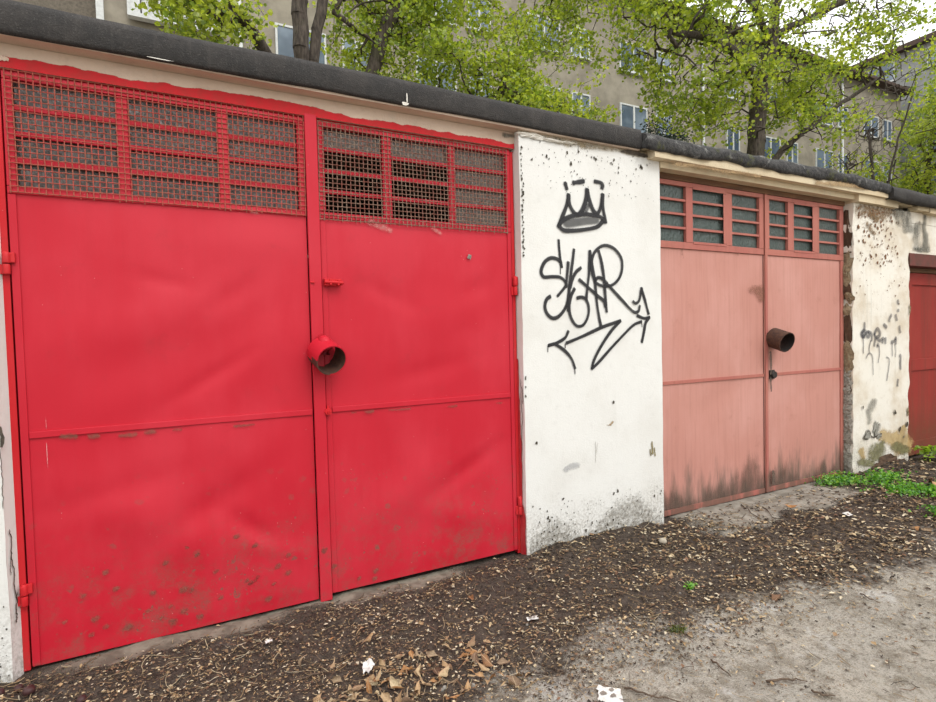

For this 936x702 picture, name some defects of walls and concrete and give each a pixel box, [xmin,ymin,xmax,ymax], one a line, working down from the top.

spalling [843,210,855,474]
peeling [865,421,882,440]
flaking render [872,453,905,469]